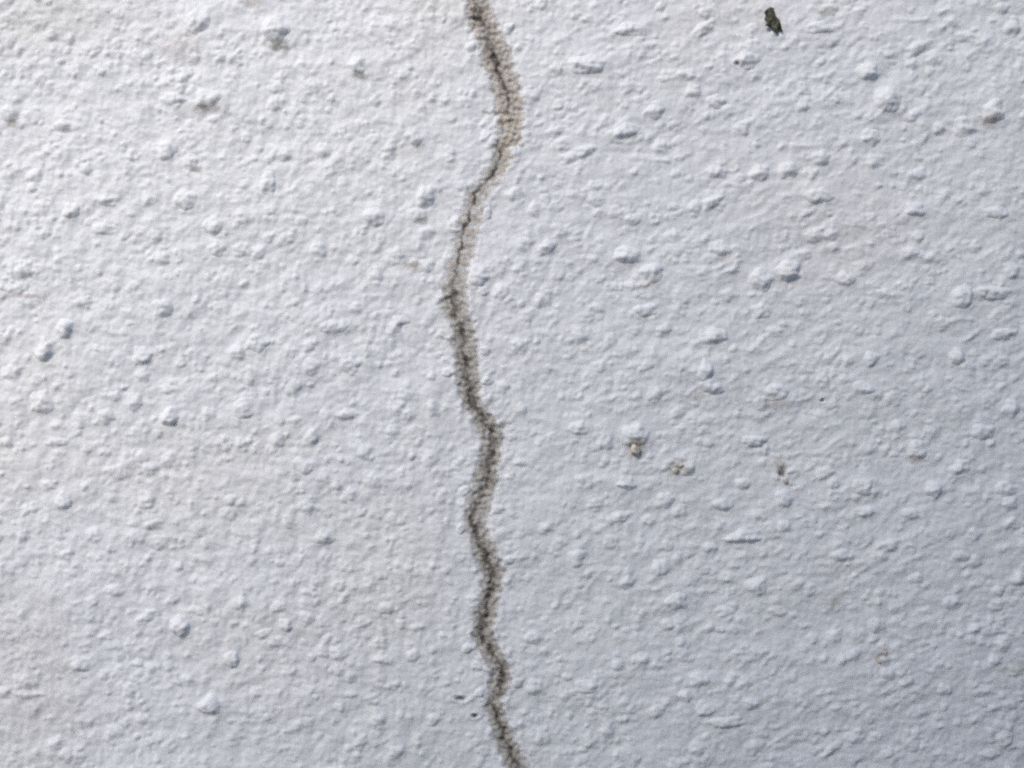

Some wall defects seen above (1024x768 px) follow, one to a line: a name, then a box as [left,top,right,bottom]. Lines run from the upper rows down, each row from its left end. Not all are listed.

crack [440,0,527,768]